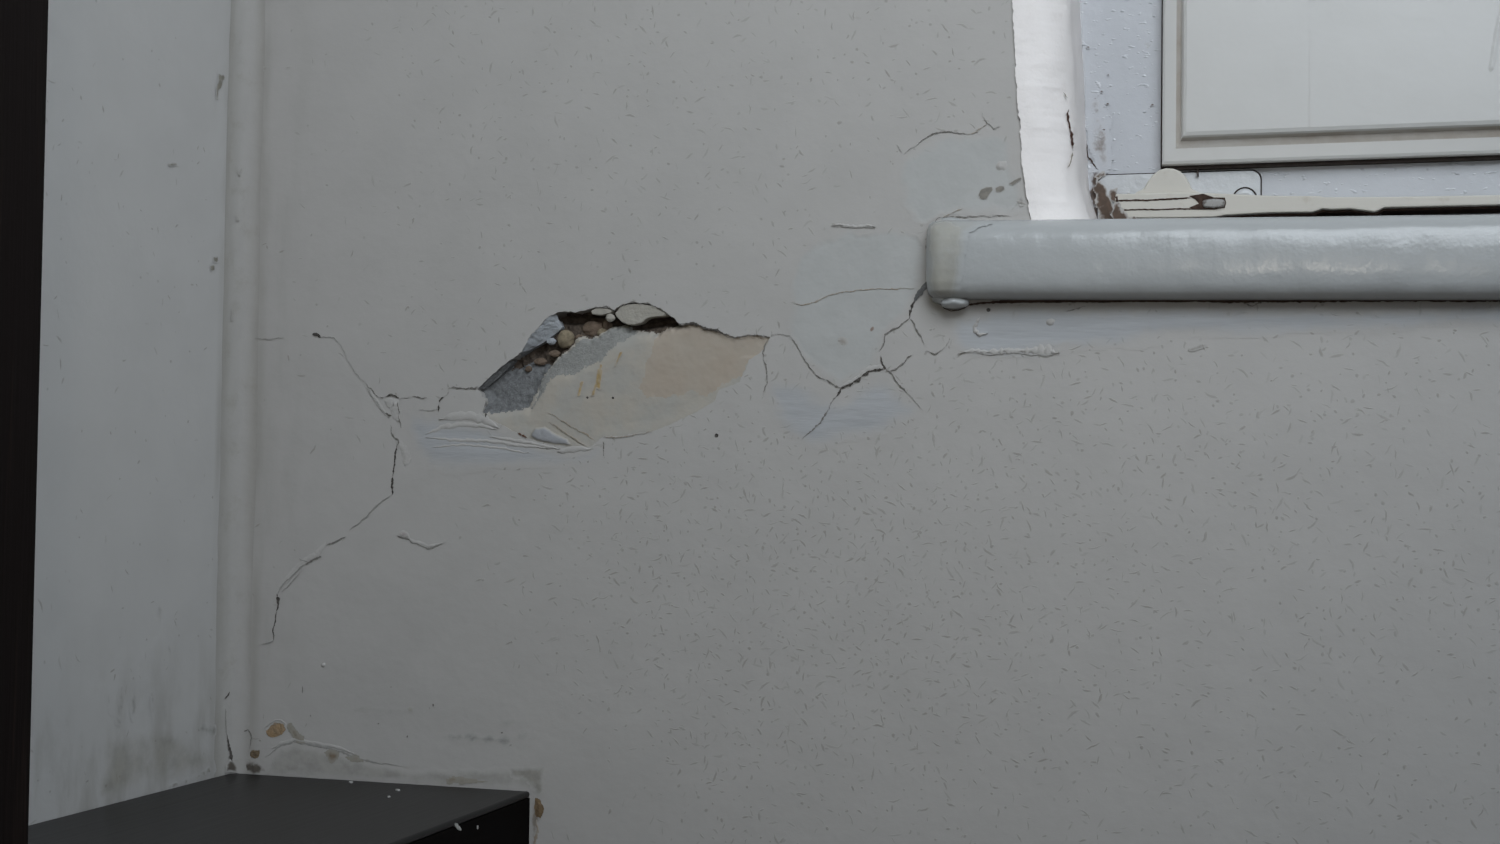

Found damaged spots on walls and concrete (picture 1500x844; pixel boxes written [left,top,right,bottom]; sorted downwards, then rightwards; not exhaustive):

flaking render [427,301,770,456]
crack [772,282,1500,438]
crack [259,333,477,644]